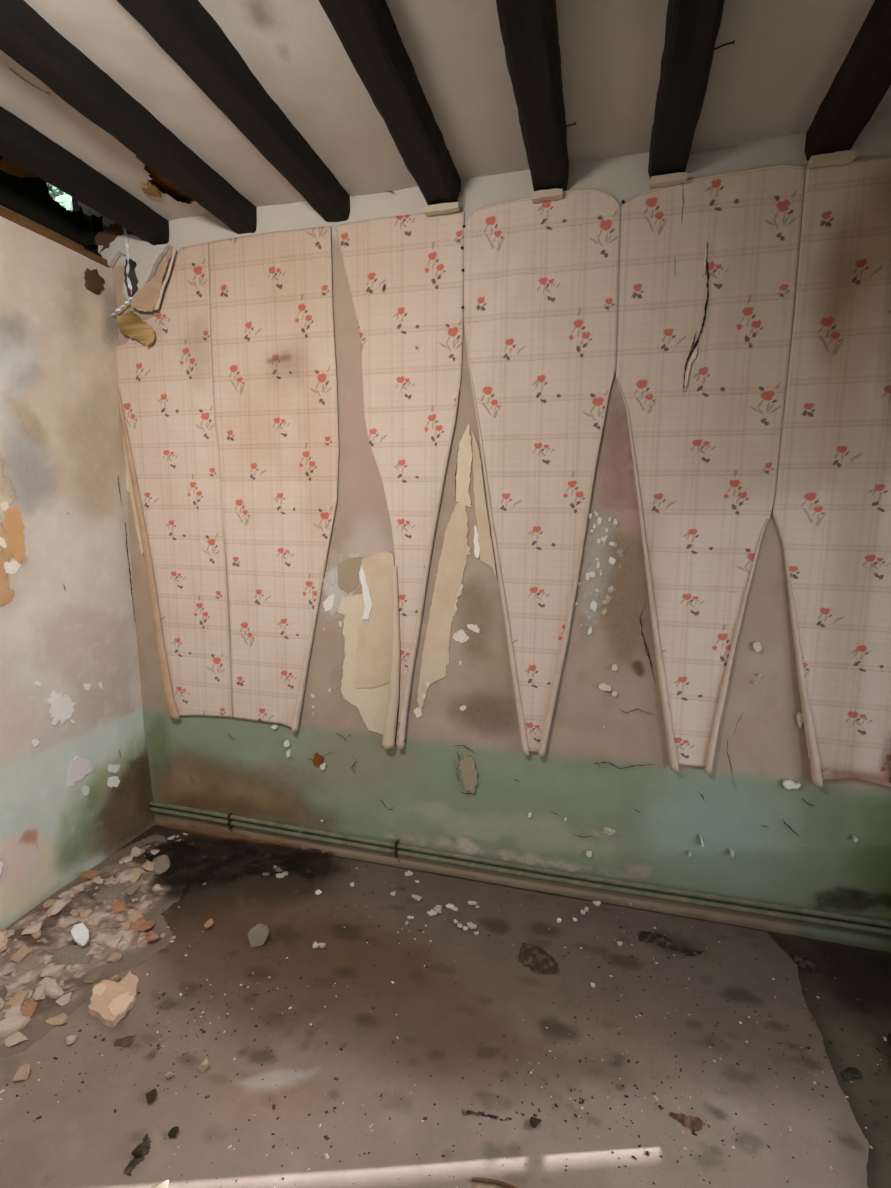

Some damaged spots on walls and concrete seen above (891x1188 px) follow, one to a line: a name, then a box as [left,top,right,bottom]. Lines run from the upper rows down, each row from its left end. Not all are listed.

flaking render [136,156,191,200]
flaking render [95,223,133,253]
flaking render [84,268,105,294]
flaking render [124,258,139,297]
peeling [466,432,497,579]
peeling [0,460,25,606]
peeling [575,511,623,635]
peeling [355,551,400,749]
peeling [453,624,480,643]
peeling [35,681,76,726]
water stain [104,723,320,849]
water stain [818,889,891,910]